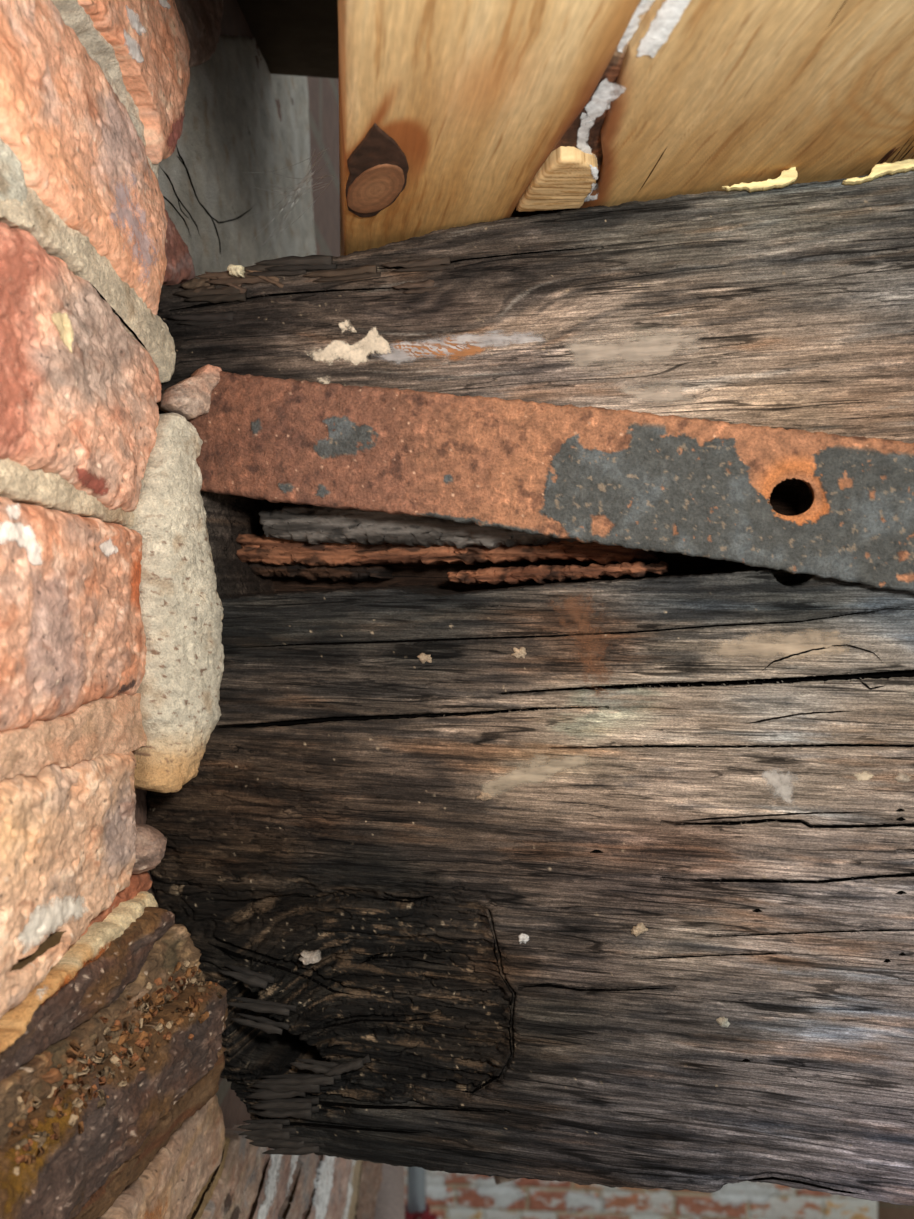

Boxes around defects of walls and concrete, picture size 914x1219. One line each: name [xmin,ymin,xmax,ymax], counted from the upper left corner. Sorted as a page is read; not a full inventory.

crack [159,145,251,254]
crack [168,267,405,311]
crack [450,247,594,263]
crack [215,605,914,749]
crack [661,811,914,884]
crack [381,895,425,903]
crack [637,929,914,959]
crack [208,943,432,1029]
crack [249,912,664,1219]